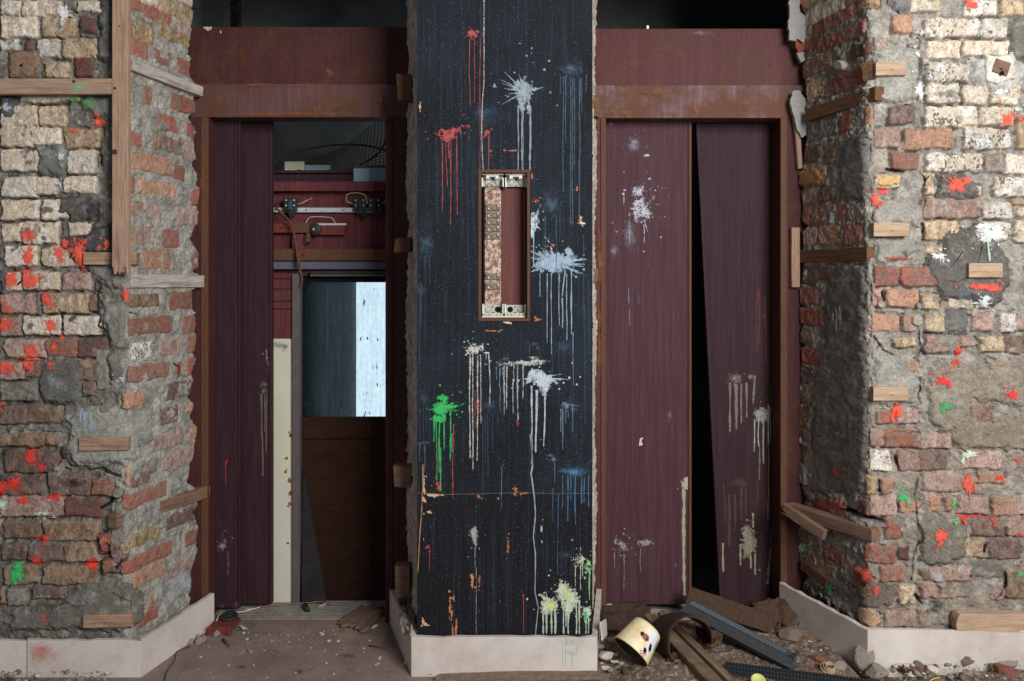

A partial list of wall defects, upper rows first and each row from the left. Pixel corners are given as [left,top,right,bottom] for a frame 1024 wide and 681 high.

flaking render [787,0,807,63]
flaking render [789,90,808,138]
spalling [877,175,900,187]
spalling [815,497,847,515]
spalling [96,535,121,574]
spalling [856,581,899,628]